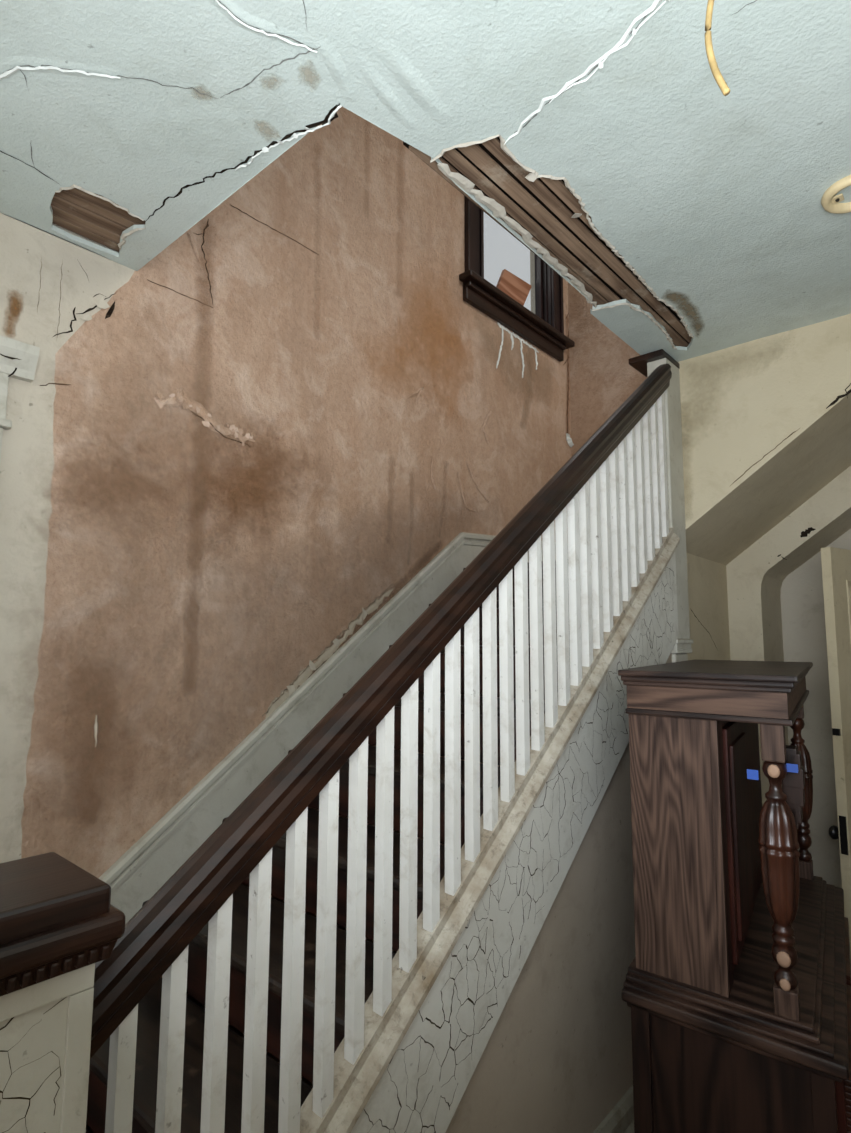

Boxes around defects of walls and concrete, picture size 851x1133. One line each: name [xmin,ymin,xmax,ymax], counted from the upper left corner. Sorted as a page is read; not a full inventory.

crack [0,0,321,99]
crack [504,0,670,145]
crack [0,143,59,184]
flaking render [55,184,146,250]
crack [146,103,342,221]
flaking render [430,134,694,339]
flaking render [592,303,677,349]
crack [826,383,851,409]
crack [731,429,799,485]
water stain [308,545,440,678]
crack [364,567,715,1133]
crack [0,997,66,1133]